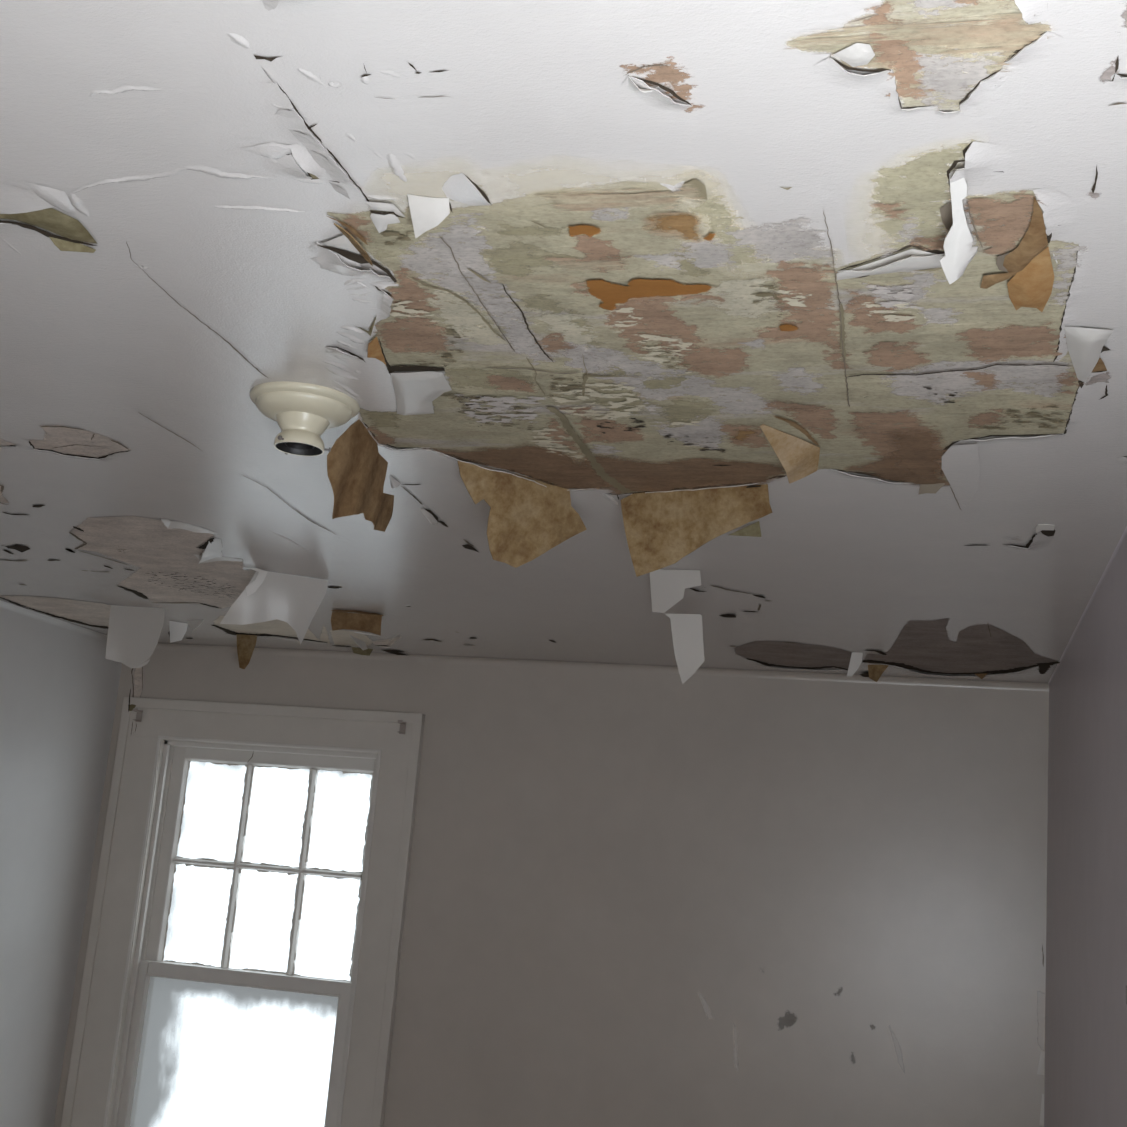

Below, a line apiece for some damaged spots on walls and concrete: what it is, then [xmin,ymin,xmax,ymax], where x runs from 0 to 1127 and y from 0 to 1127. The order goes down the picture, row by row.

peeling [620,57,704,113]
peeling [787,0,1065,119]
peeling [0,182,97,255]
crack [126,243,268,378]
peeling [0,425,136,461]
peeling [307,140,1114,684]
peeling [0,516,402,669]